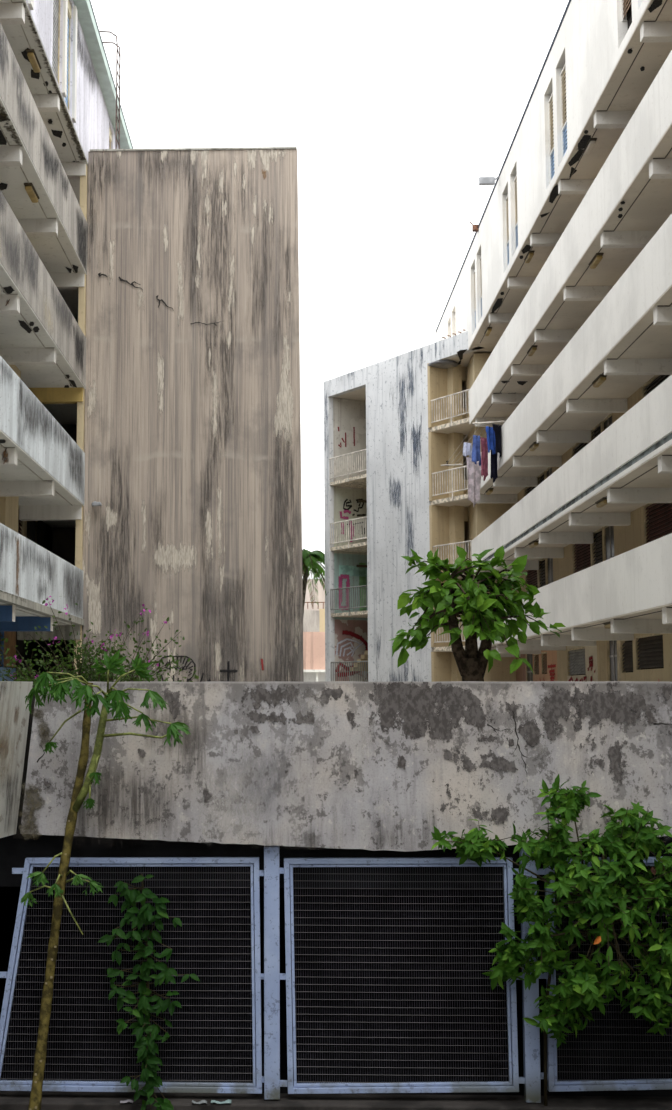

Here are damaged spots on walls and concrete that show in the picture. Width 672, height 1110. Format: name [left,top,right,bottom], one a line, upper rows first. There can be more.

water stain [43,143,68,193]
water stain [77,201,115,283]
crack [98,273,223,326]
water stain [141,149,286,682]
water stain [265,321,300,682]
water stain [23,460,176,681]
water stain [33,709,52,747]
peeling [162,688,184,721]
peeling [234,682,672,786]
crack [487,711,528,773]
water stain [82,775,160,832]
peeling [432,779,517,826]